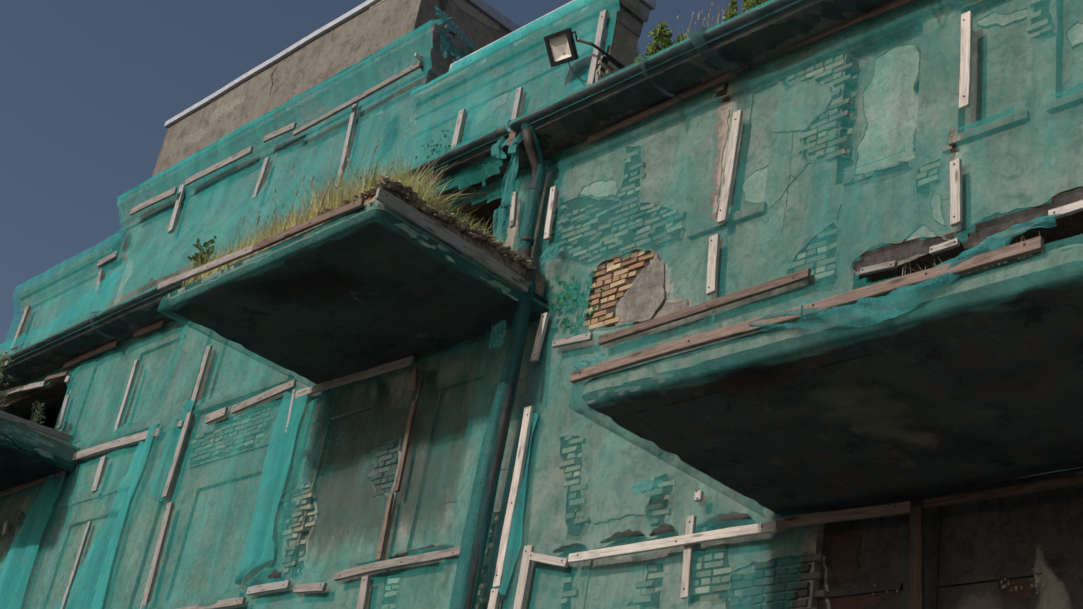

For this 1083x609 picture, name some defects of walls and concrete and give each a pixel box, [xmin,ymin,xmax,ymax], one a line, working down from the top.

flaking render [975,0,1083,49]
flaking render [779,44,960,242]
flaking render [547,144,690,331]
flaking render [786,223,843,292]
water stain [301,370,469,549]
flaking render [368,437,402,498]
flaking render [279,480,319,581]
flaking render [688,542,831,609]